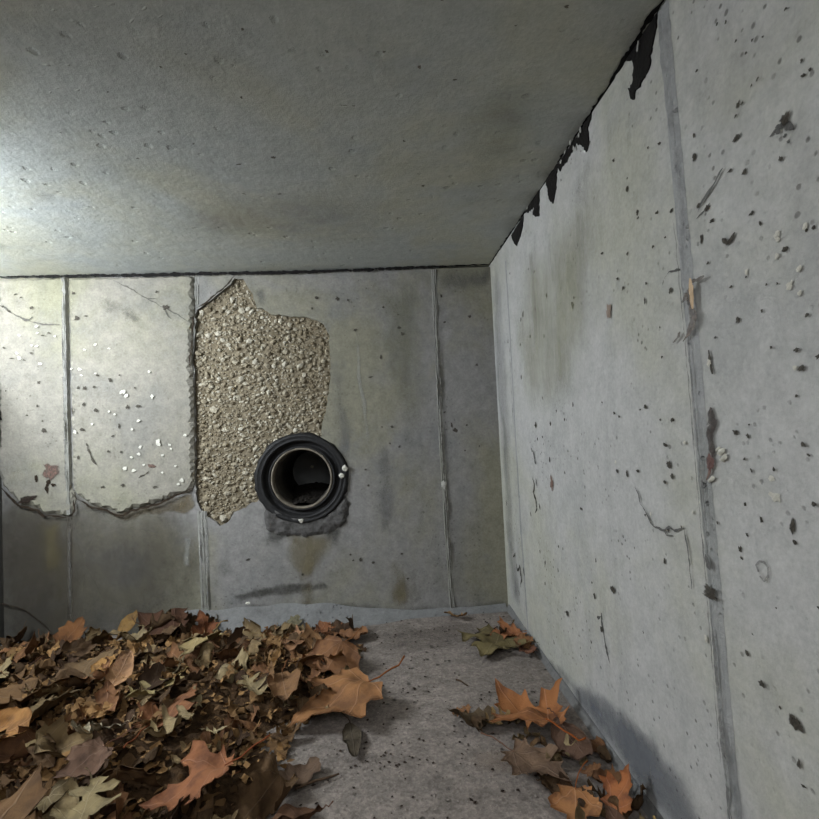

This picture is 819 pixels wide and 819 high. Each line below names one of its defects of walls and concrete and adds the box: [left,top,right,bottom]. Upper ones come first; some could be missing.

crack [0,0,665,370]
crack [697,168,723,218]
peeling [0,276,331,525]
crack [635,488,692,589]
leakage [237,585,309,598]